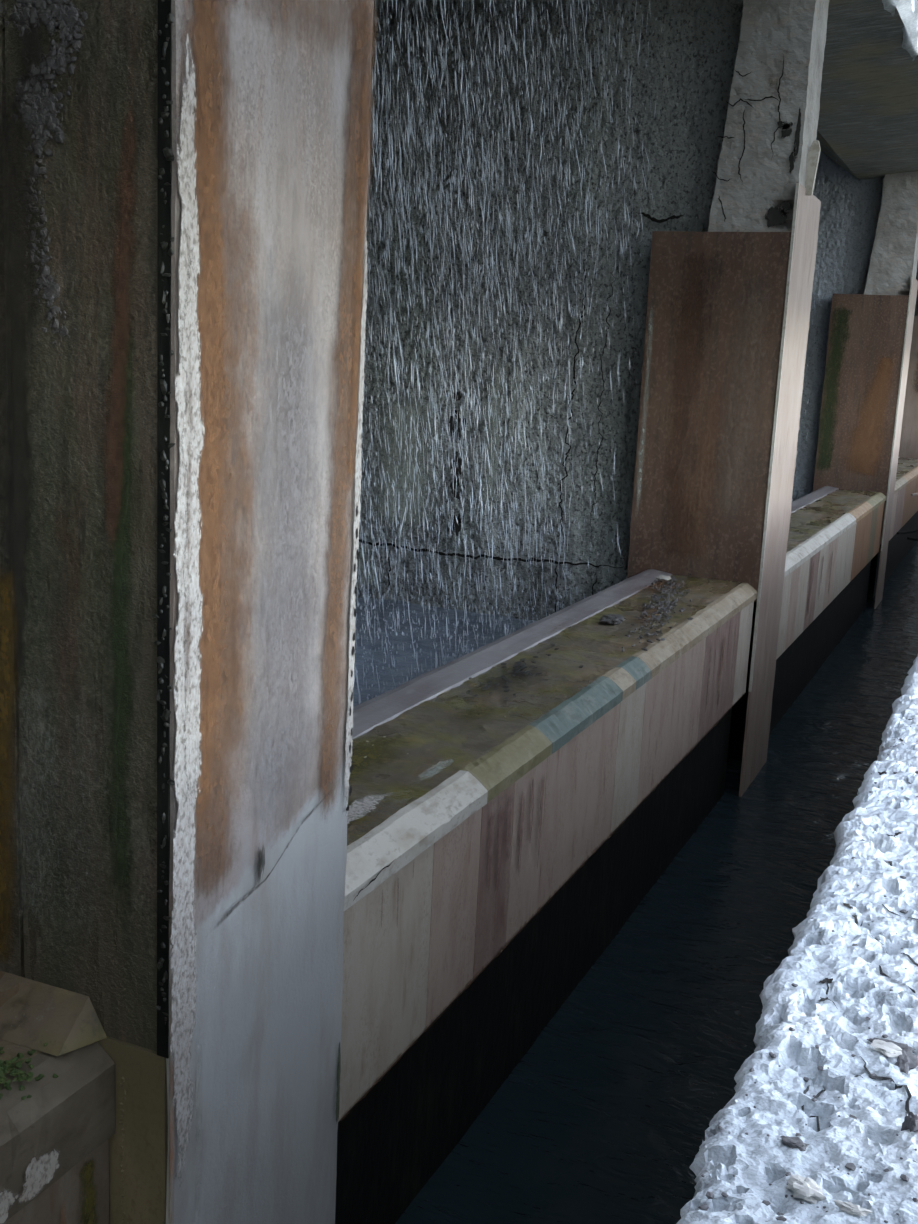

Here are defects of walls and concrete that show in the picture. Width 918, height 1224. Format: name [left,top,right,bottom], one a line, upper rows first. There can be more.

spalling [3,0,88,346]
crack [636,212,683,223]
crack [712,54,784,222]
water stain [0,100,132,957]
rust [185,0,258,893]
rust [321,0,374,807]
peeling [0,1149,59,1224]
crack [801,1085,831,1132]
crack [854,1056,912,1116]